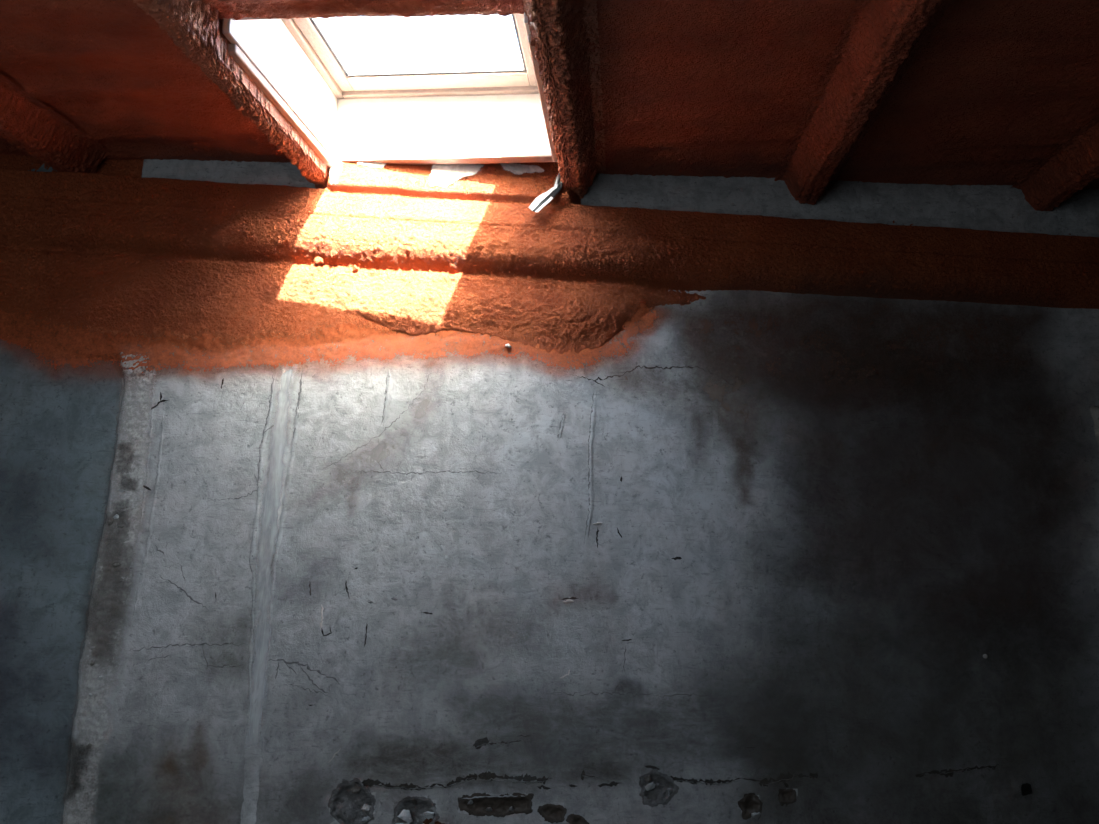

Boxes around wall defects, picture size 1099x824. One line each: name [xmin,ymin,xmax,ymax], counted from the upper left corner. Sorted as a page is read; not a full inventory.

crack [571,365,710,543]
crack [155,542,210,611]
crack [130,642,339,696]
crack [347,735,620,791]
crack [645,765,756,786]
peeling [396,798,434,824]